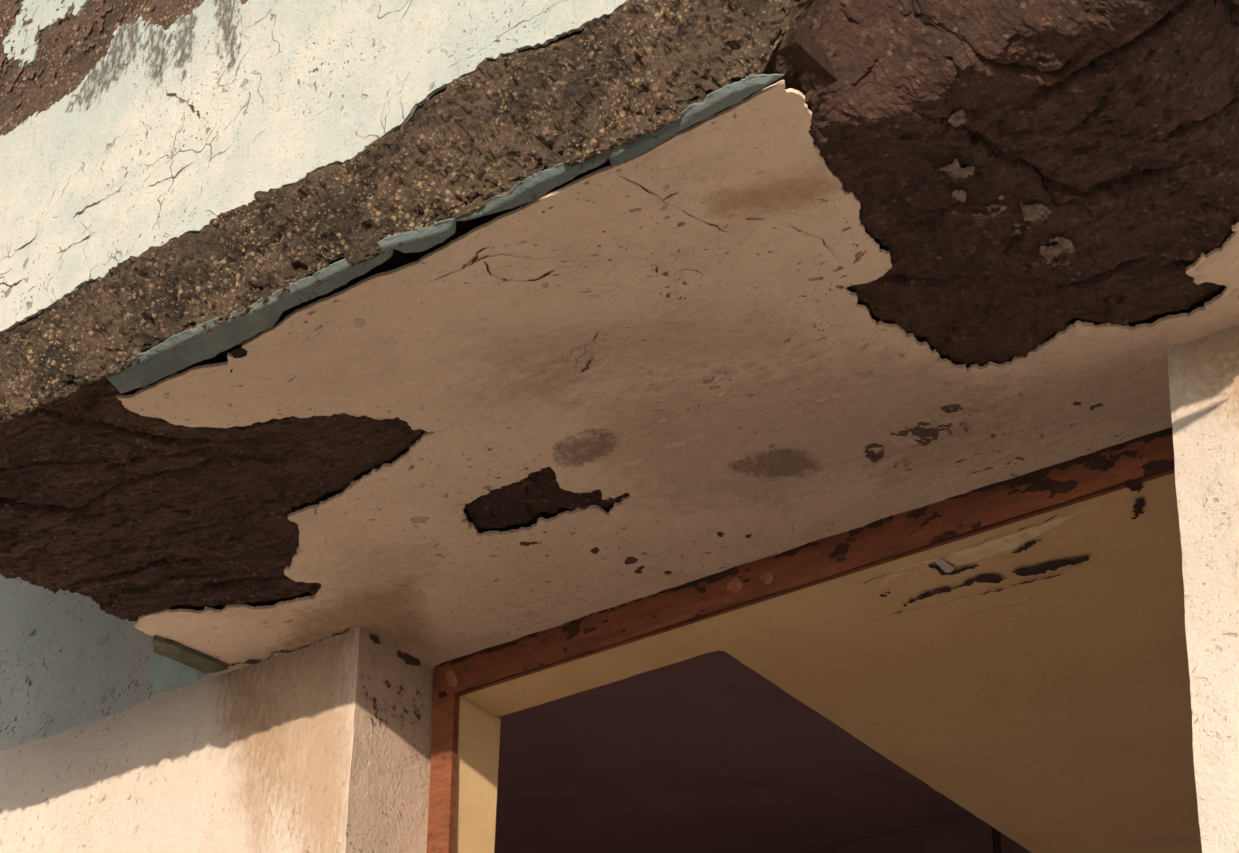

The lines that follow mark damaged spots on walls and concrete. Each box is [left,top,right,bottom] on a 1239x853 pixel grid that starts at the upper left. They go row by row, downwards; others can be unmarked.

spalling [0,0,1239,622]
damp [733,449,814,477]
peeling [440,632,547,673]
peeling [561,566,760,653]